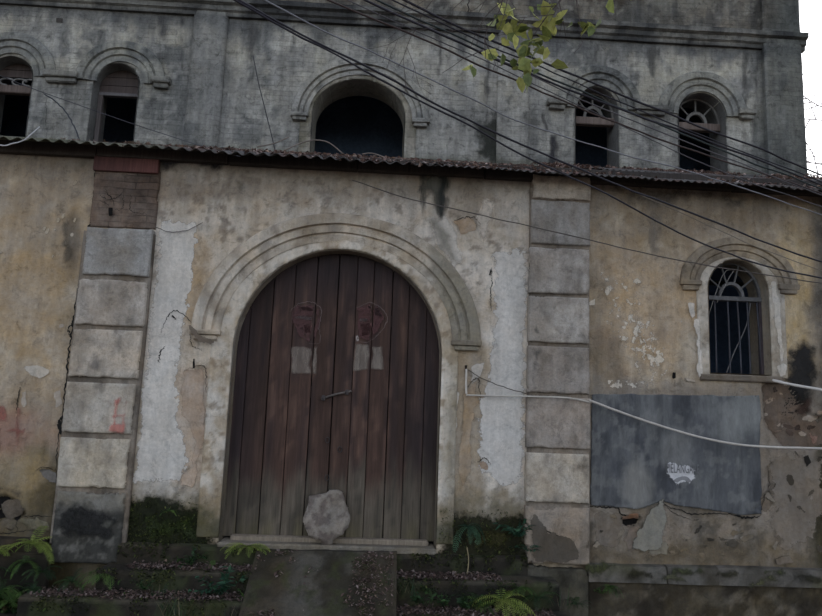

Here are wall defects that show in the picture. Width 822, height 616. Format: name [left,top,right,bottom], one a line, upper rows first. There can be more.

water stain [421,176,453,256]
peeling [432,200,493,266]
crack [55,288,78,479]
peeling [133,217,207,488]
peeling [471,248,528,490]
peeling [601,269,676,389]
peeling [688,302,703,377]
flaking render [761,281,822,565]